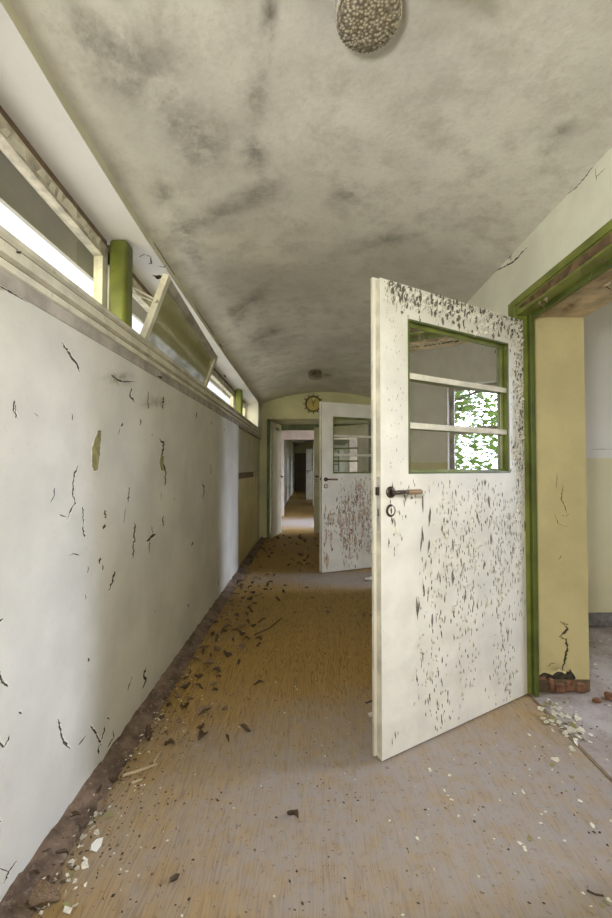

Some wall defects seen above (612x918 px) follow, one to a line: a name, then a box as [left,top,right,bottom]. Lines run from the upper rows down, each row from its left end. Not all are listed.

crack [139,243,175,275]
crack [0,285,27,302]
crack [61,341,80,372]
crack [13,400,39,418]
crack [51,375,175,600]
spalling [384,279,526,731]
peeling [324,476,372,570]
crack [547,620,570,671]
crack [0,664,9,687]
crack [0,735,11,749]
crack [58,716,114,754]
crack [0,861,17,886]